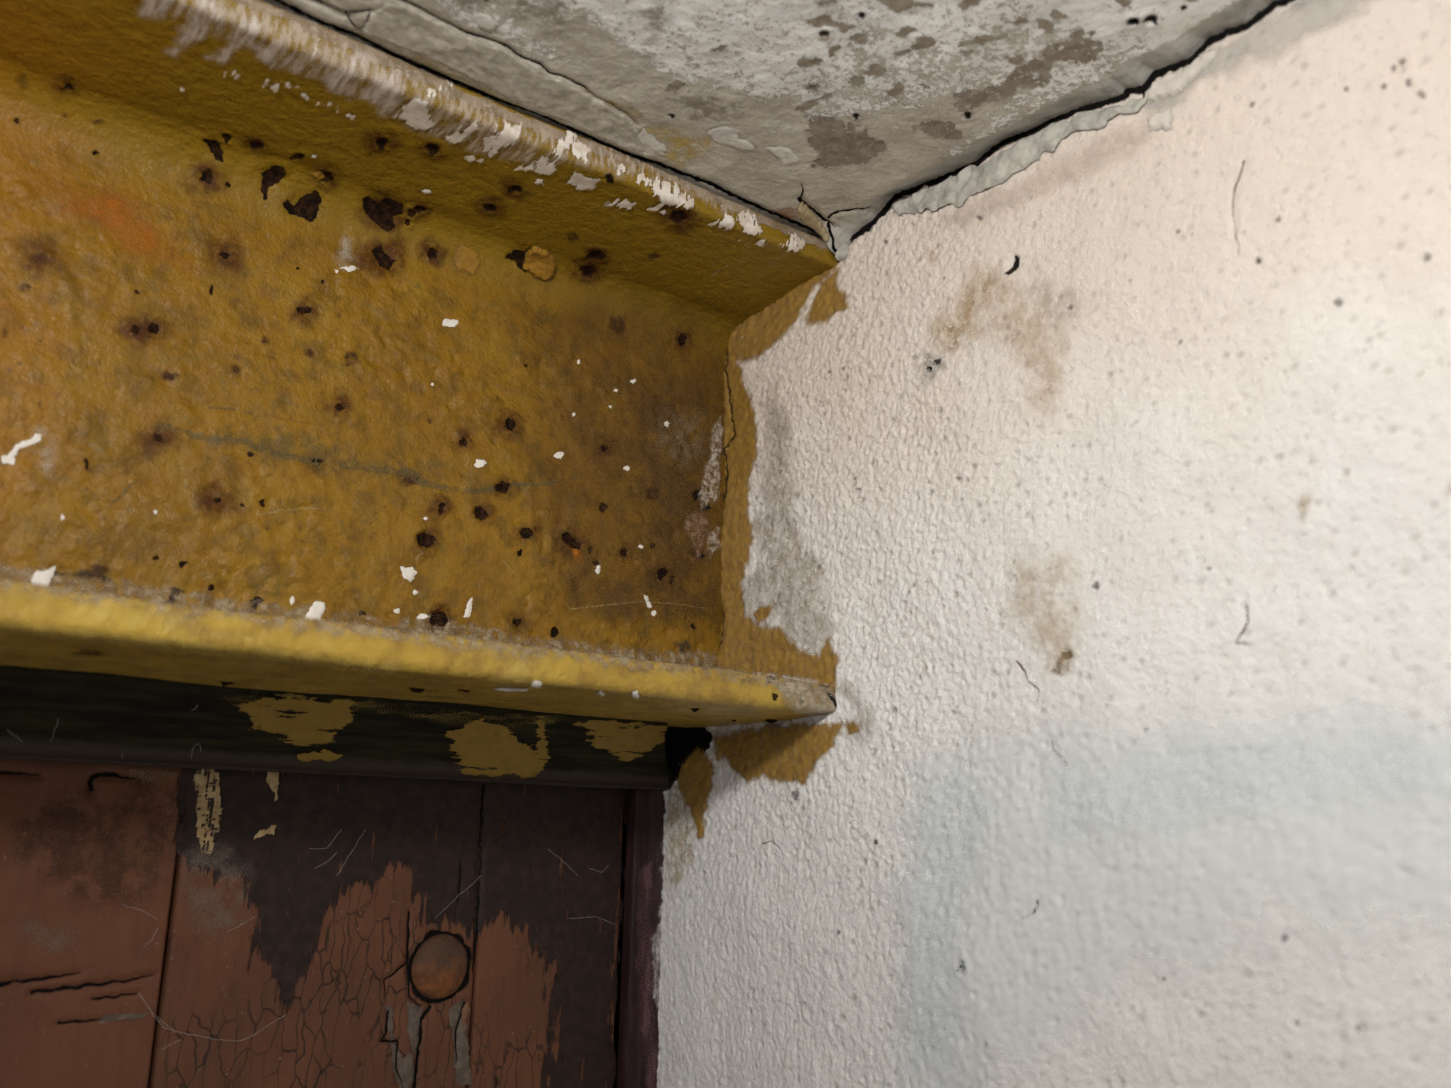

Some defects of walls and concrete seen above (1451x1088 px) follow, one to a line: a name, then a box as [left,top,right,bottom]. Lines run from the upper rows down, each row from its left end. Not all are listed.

crack [273,0,1293,262]
corrosion [198,165,231,190]
corrosion [661,206,694,233]
corrosion [474,506,494,520]
corrosion [517,527,537,557]
corrosion [407,610,449,633]
peeling [770,679,858,734]
peeling [297,749,343,762]
peeling [266,772,279,801]
peeling [193,769,222,854]
peeling [254,825,276,839]
crack [0,972,154,1025]